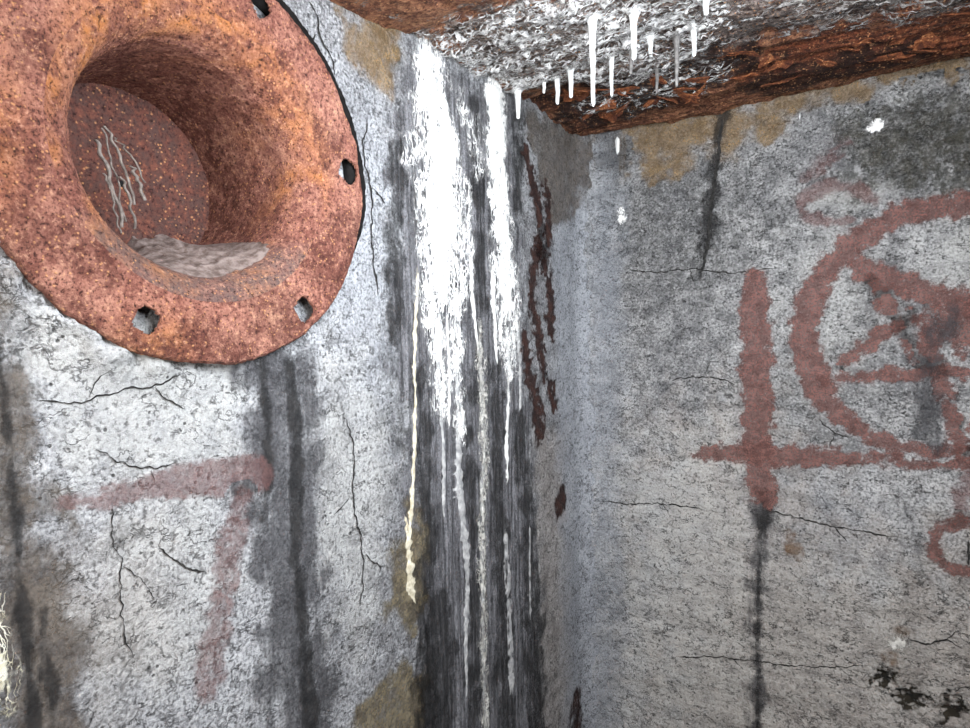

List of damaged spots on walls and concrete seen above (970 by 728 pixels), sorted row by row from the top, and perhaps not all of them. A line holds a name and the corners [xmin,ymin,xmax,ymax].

corrosion [717,51,801,88]
corrosion [815,58,837,67]
corrosion [866,32,941,62]
corrosion [551,73,710,124]
corrosion [520,137,558,446]
crack [37,368,184,409]
water stain [345,0,970,728]
water stain [231,349,338,728]